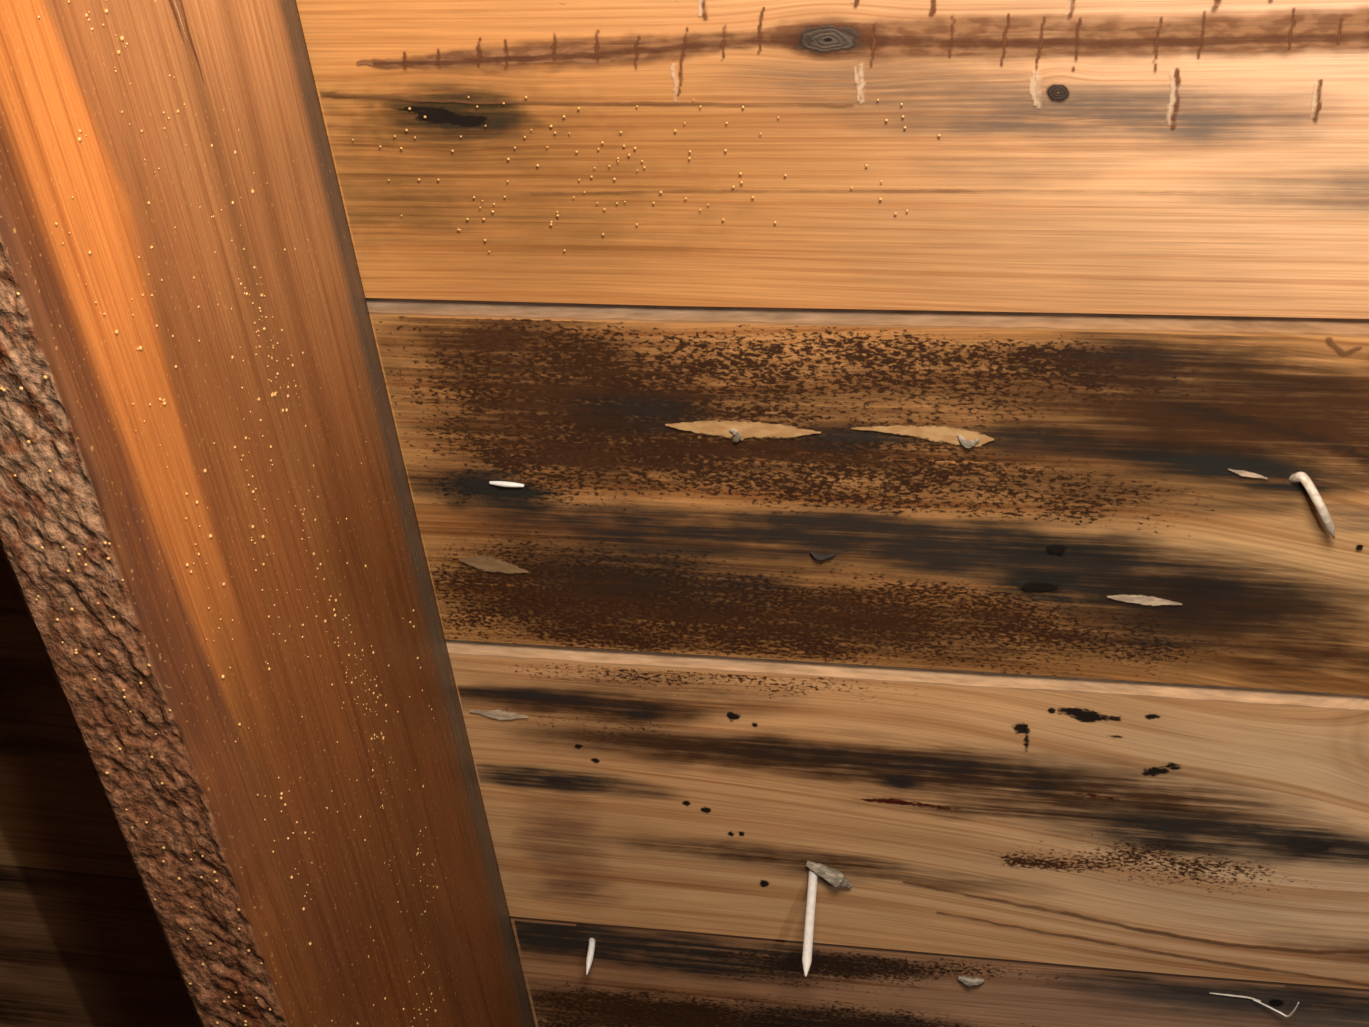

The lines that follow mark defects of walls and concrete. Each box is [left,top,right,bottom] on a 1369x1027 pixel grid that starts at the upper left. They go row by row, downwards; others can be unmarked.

crack [170,0,205,84]
water stain [387,94,520,138]
water stain [960,93,1268,138]
water stain [377,316,1369,896]
water stain [514,921,1070,1027]
water stain [1089,974,1369,1027]